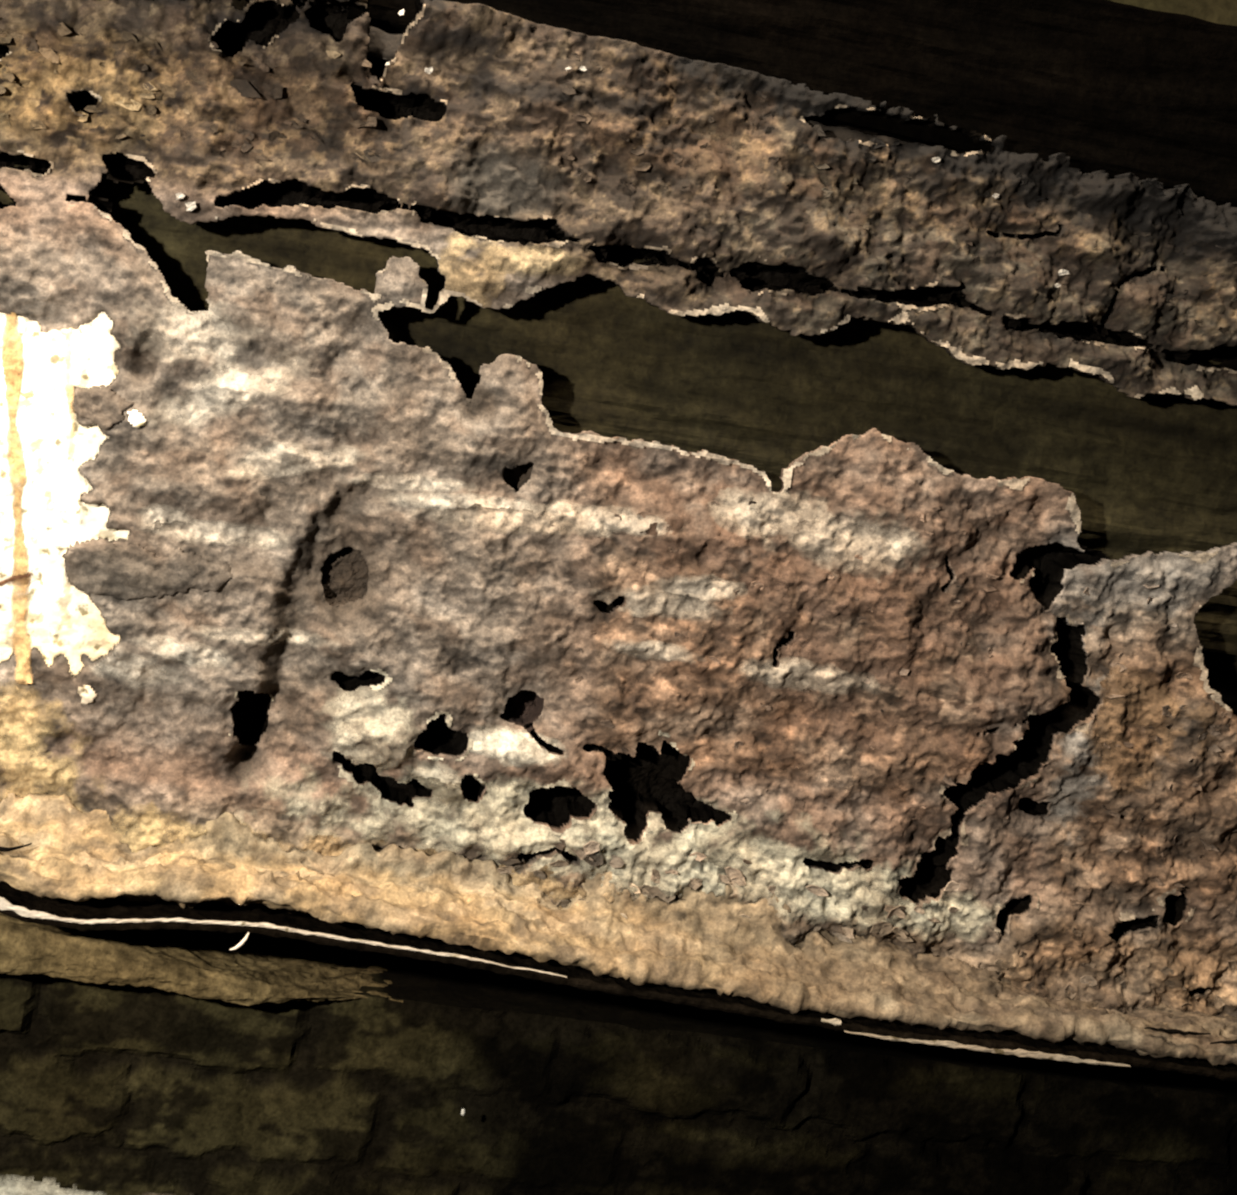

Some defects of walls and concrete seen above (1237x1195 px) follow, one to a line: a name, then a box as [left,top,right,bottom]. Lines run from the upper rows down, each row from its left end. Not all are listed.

crack [215,178,1237,374]
spalling [561,53,1194,288]
corrosion [0,312,81,812]
peeling [0,312,130,704]
corrosion [113,806,207,853]
spalling [496,839,961,946]
spalling [575,544,999,820]
crack [803,858,872,871]
crack [893,614,1100,910]
spalling [994,921,1237,1016]
spalling [1055,583,1237,914]
crack [1144,1027,1237,1044]